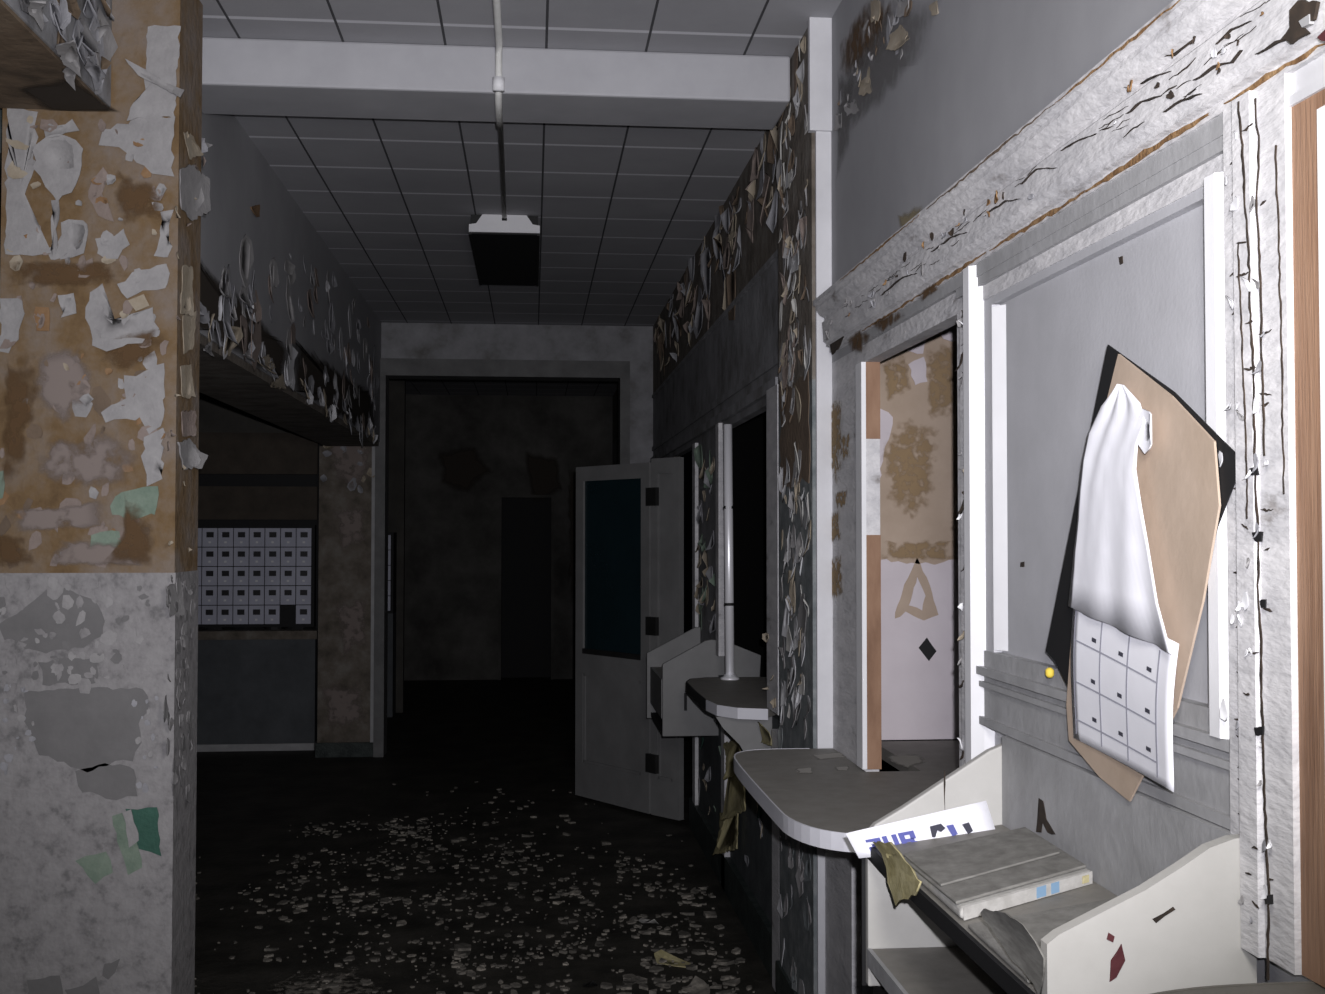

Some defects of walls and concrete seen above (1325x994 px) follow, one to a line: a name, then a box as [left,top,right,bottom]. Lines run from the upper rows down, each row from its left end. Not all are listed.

flaking render [0,448,196,884]
peeling [0,0,380,548]
peeling [653,35,832,748]
peeling [832,556,843,596]
peeling [832,491,846,541]
peeling [831,402,849,476]
peeling [833,0,912,131]
peeling [880,310,964,620]
crack [844,0,1286,317]
peeling [1210,34,1239,74]
crack [1229,98,1285,980]
peeling [1281,0,1325,44]